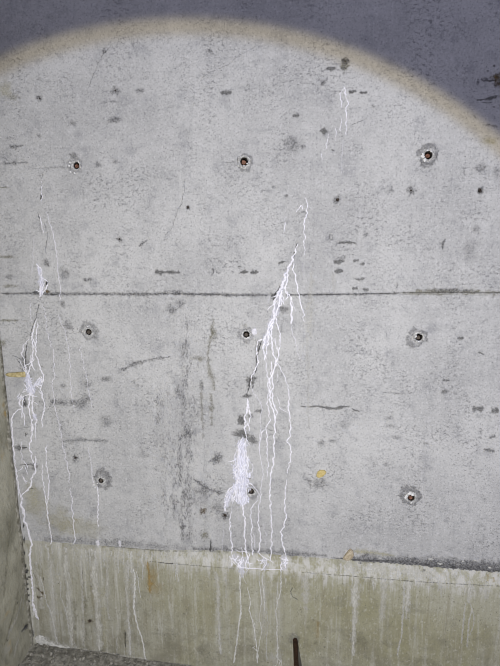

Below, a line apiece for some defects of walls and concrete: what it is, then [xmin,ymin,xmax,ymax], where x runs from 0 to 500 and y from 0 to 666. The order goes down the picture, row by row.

damp [30,240,49,297]
crack [243,343,261,397]
crack [235,410,261,443]
damp [215,198,308,666]
damp [11,299,163,659]
efflorescence [340,564,359,656]